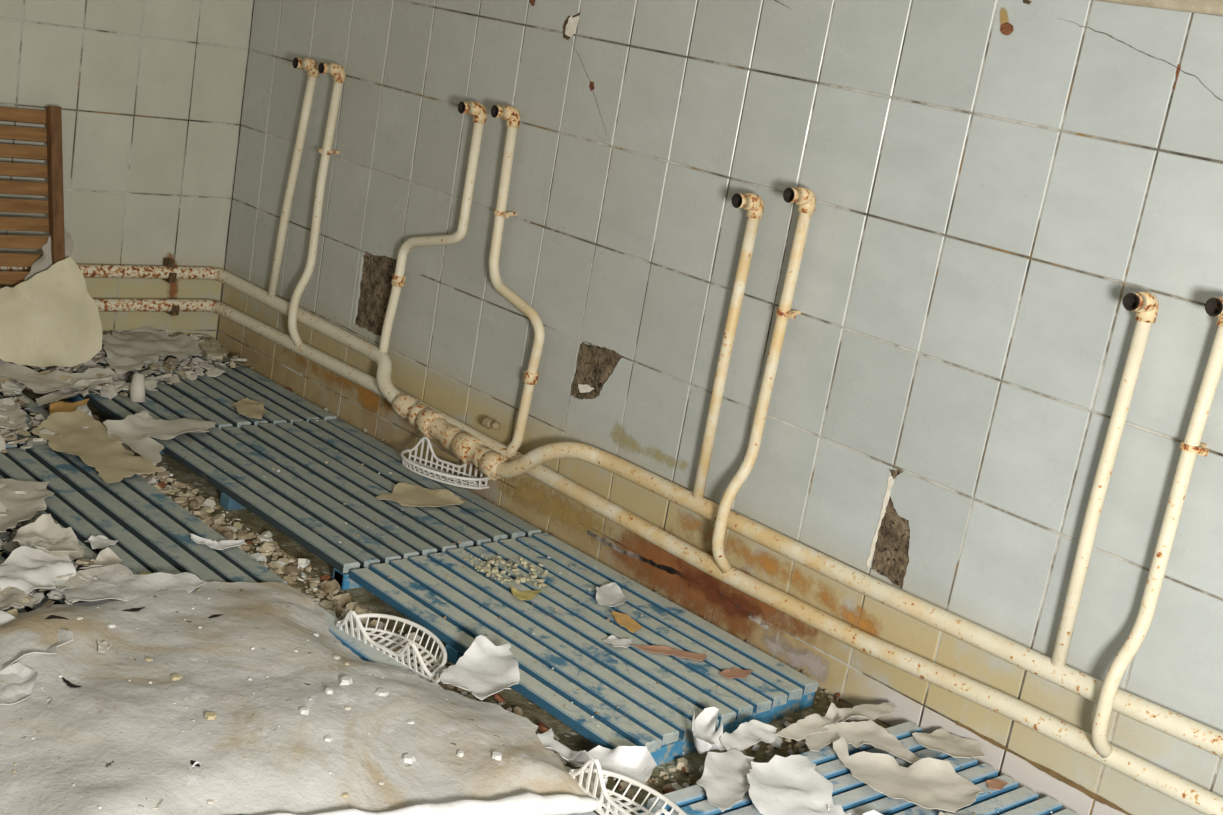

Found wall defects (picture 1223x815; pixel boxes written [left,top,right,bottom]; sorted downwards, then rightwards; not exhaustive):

rust [168,254,178,299]
spalling [355,251,397,336]
spalling [570,342,624,400]
spalling [866,469,910,588]